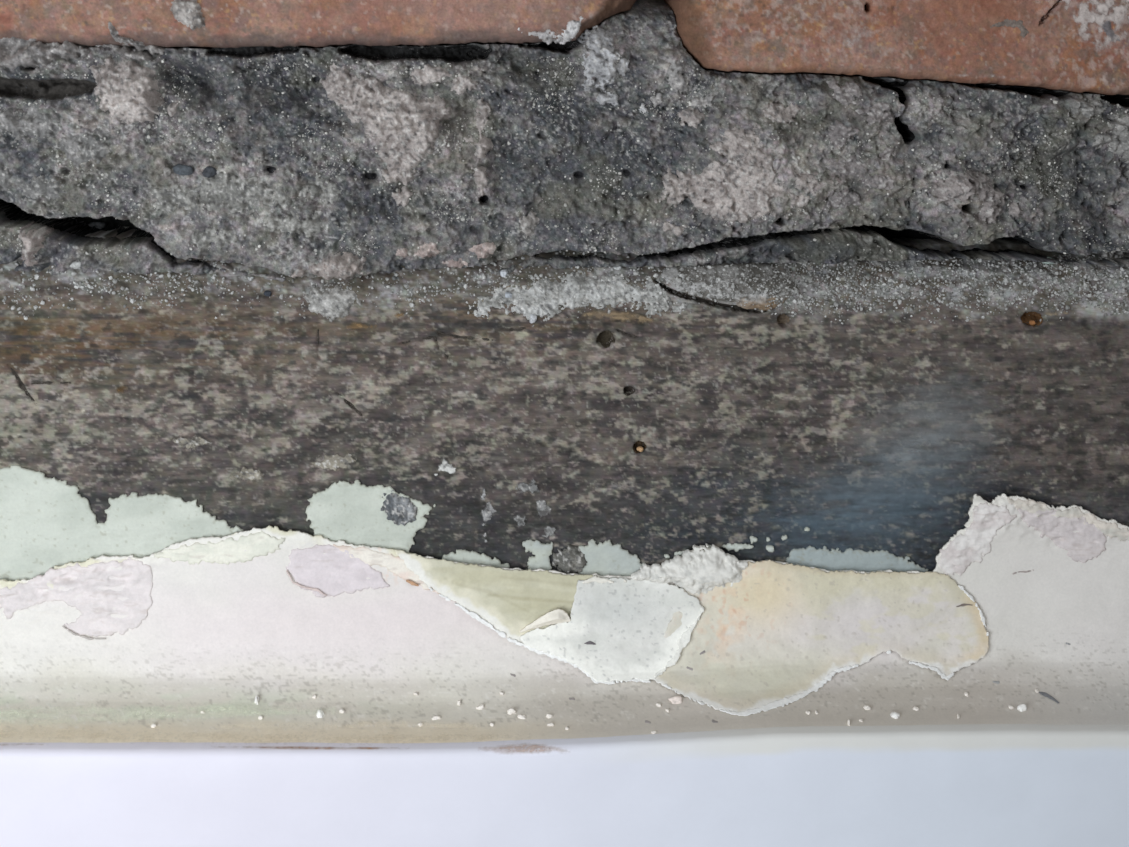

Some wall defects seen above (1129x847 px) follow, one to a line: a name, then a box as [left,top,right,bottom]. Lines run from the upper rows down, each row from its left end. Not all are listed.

crack [862,77,915,143]
crack [962,84,1070,97]
crack [1099,94,1129,107]
crack [151,238,206,263]
crack [535,178,1044,313]
peeling [229,467,262,481]
peeling [0,465,244,581]
peeling [305,454,436,553]
peeling [442,524,510,568]
peeling [522,526,556,570]
peeling [578,539,645,576]
peeling [708,535,928,572]